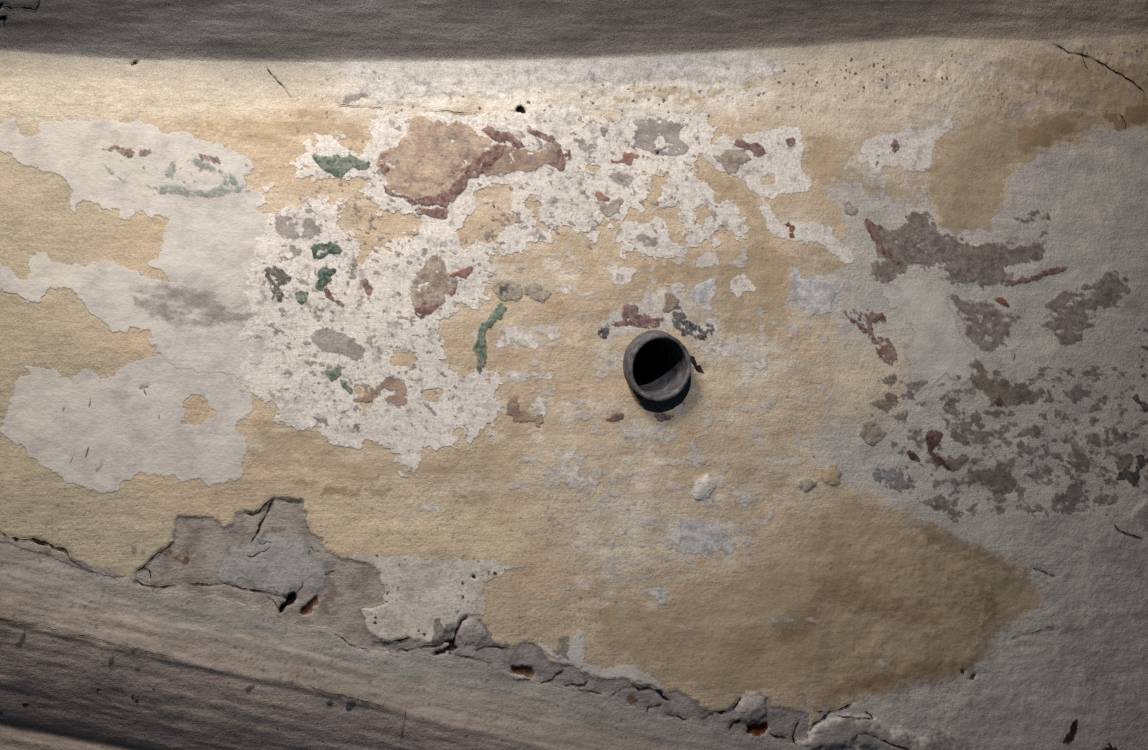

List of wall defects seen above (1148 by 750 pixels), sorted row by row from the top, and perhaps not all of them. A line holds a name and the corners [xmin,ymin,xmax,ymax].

peeling [343,92,368,102]
leakage [806,104,1148,234]
peeling [0,104,856,494]
peeling [877,277,977,388]
peeling [508,398,713,525]
crack [0,531,93,573]
crack [131,541,334,607]
crack [247,497,297,557]
spalling [0,498,809,743]
crack [334,616,508,662]
leakage [597,502,987,692]
crack [540,670,741,730]